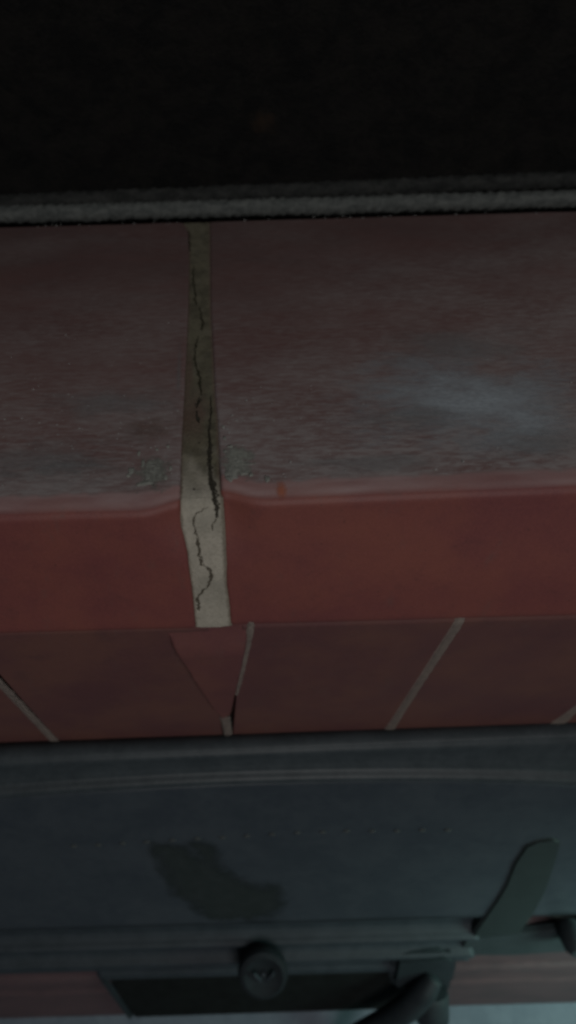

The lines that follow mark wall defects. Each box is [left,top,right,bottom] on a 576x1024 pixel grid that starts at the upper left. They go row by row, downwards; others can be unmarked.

crack [188,231,220,610]